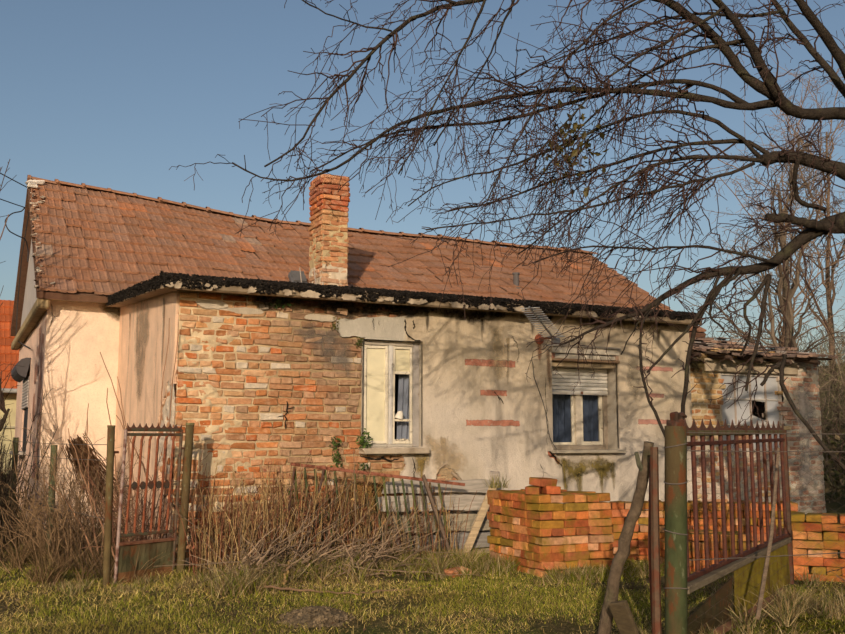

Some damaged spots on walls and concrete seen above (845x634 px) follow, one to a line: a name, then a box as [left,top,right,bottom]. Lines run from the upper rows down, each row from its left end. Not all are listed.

damp [102,305,148,397]
peeling [478,303,525,312]
flaking render [158,281,427,567]